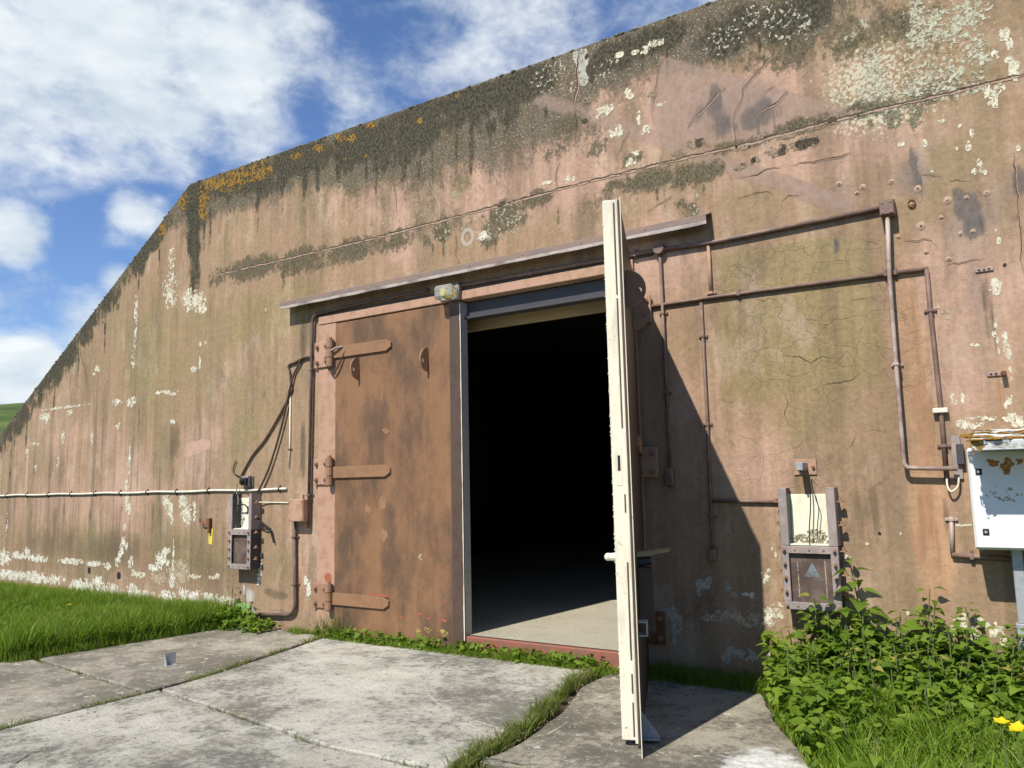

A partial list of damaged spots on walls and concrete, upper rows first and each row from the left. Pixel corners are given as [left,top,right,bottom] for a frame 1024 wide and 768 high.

peeling [984,27,1020,108]
peeling [609,124,624,139]
damp [709,87,729,134]
damp [302,168,320,199]
crack [217,50,1024,286]
damp [187,184,211,294]
damp [953,189,983,237]
peeling [162,248,207,315]
crack [786,352,860,401]
peeling [955,395,1024,430]
peeling [0,442,235,606]
peeling [695,576,785,628]